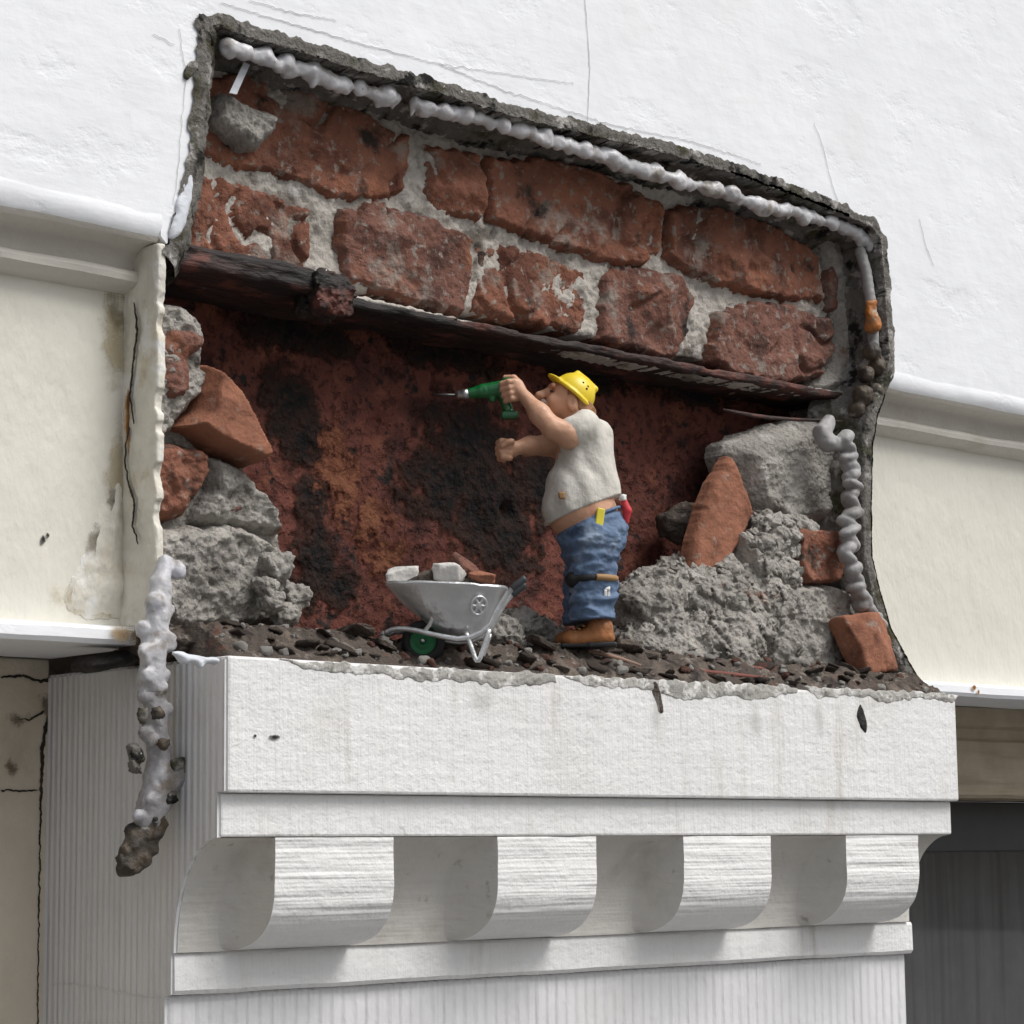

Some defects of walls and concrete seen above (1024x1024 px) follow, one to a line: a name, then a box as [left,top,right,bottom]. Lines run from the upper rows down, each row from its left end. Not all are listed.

crack [124,302,139,544]
water stain [224,312,363,616]
spalling [120,13,917,674]
water stain [376,335,733,585]
crack [1,673,64,683]
peeling [280,658,958,703]
crack [1,711,48,1024]